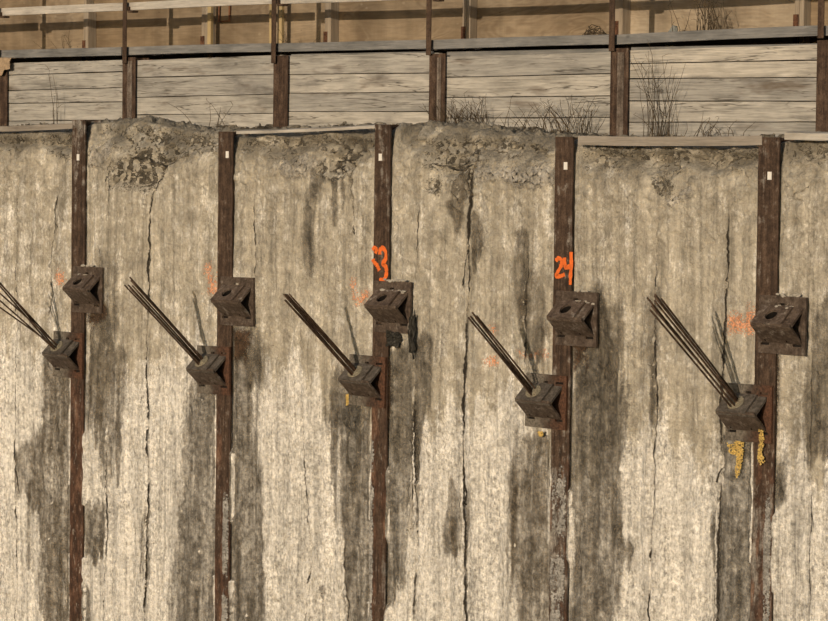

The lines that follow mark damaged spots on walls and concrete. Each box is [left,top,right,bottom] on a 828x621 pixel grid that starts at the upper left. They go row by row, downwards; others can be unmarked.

leakage [15,358,70,621]
crack [142,481,150,608]
crack [145,161,176,456]
leakage [167,382,215,621]
leakage [228,331,265,621]
leakage [325,364,371,621]
crack [461,173,473,621]
leakage [506,432,550,621]
crack [716,467,724,621]
crack [719,214,730,443]
leakage [710,435,752,621]